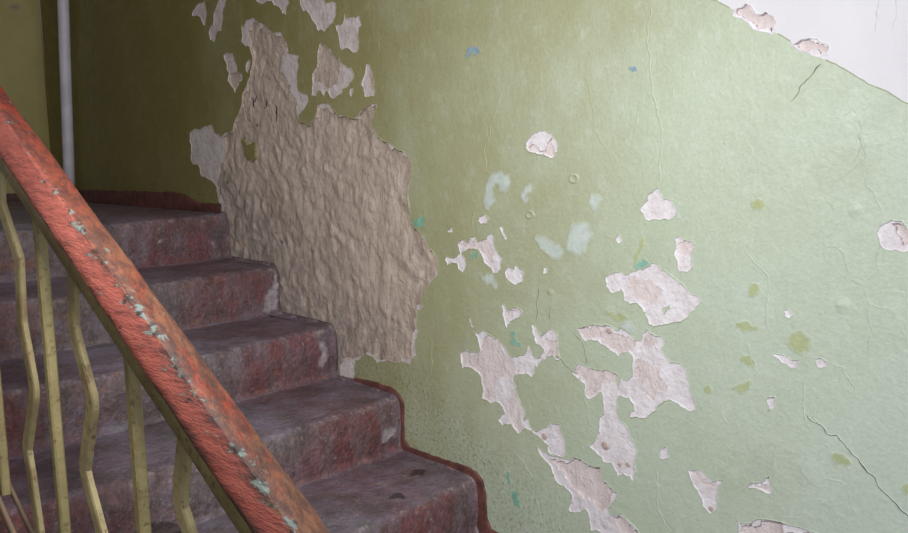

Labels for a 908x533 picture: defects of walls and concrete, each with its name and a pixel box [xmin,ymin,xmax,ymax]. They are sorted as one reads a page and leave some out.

flaking render [732,3,778,35]
flaking render [790,37,831,58]
peeling [526,130,559,159]
flaking render [189,0,533,379]
peeling [640,187,677,221]
peeling [532,220,594,275]
peeling [876,219,908,253]
peeling [460,236,701,533]
peeling [379,426,398,445]
crack [805,413,908,516]
peeling [688,468,724,515]
flaking render [736,518,818,533]